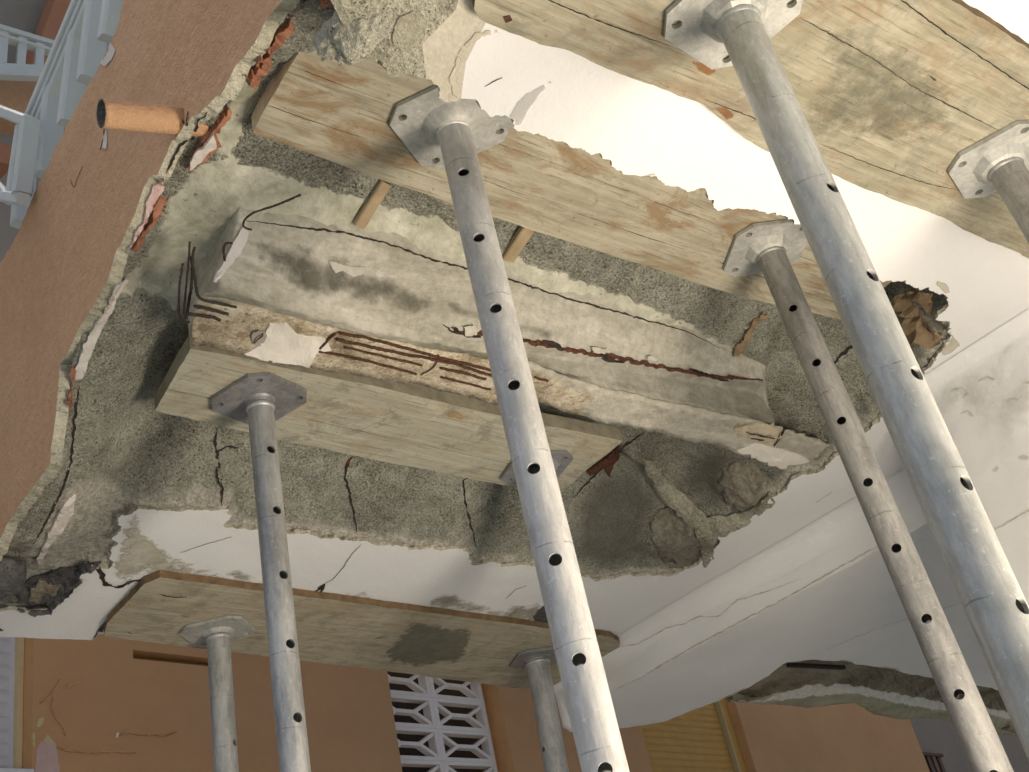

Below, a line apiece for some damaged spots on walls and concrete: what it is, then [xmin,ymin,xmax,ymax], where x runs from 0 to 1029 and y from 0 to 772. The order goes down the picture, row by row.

peeling [188,105,232,171]
spalling [213,224,249,283]
peeling [65,277,129,407]
peeling [244,322,492,390]
crack [32,386,80,545]
crack [213,428,238,505]
peeling [734,422,810,469]
spalling [18,492,102,617]
crack [316,456,361,592]
crack [462,478,477,547]
spalling [724,660,952,722]
spalling [976,686,1018,736]